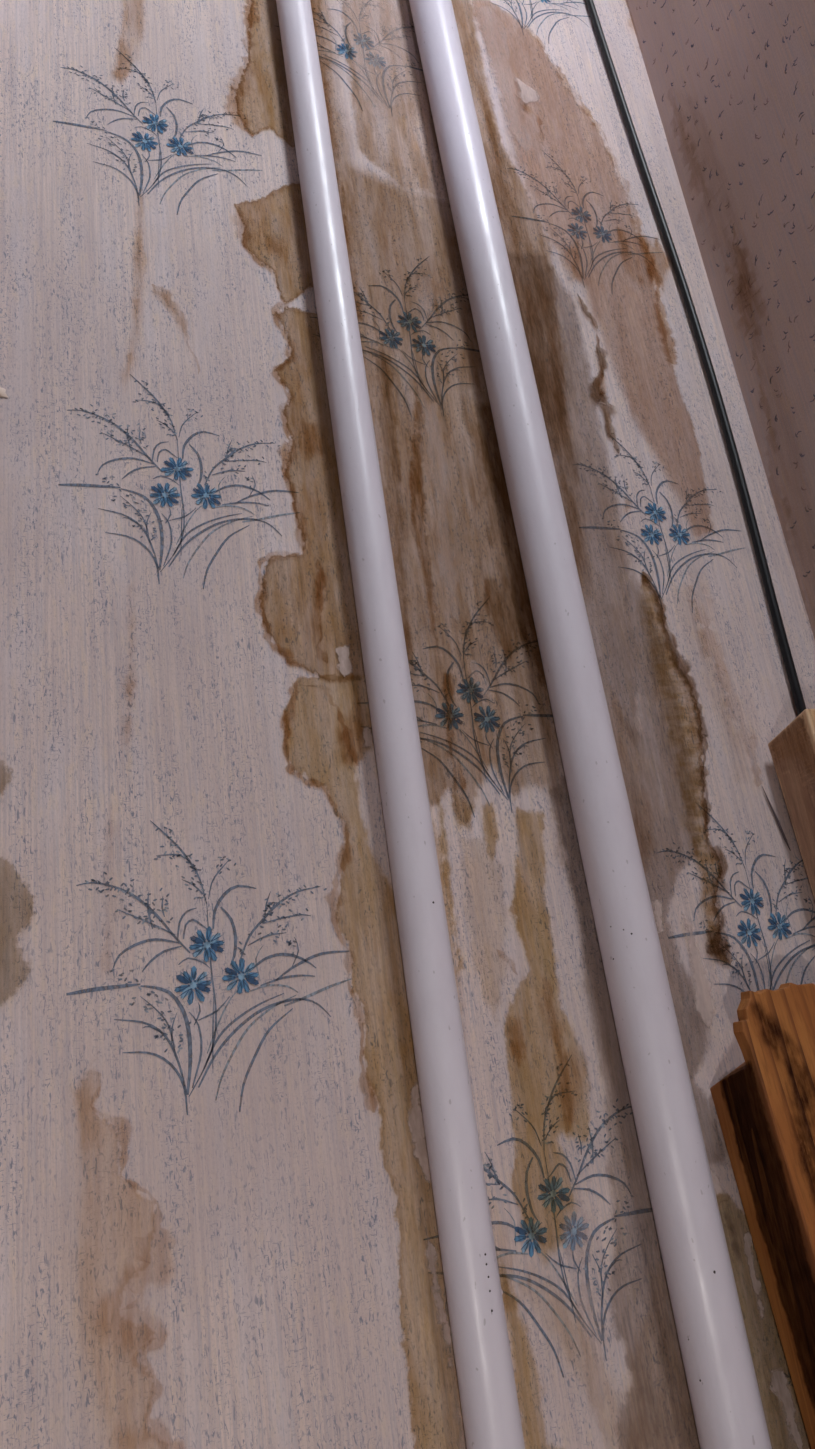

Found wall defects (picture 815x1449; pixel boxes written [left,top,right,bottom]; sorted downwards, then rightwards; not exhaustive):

damp [516,78,538,103]
damp [336,646,352,677]
damp [685,920,715,1027]
damp [720,1062,815,1407]
damp [771,1371,803,1449]